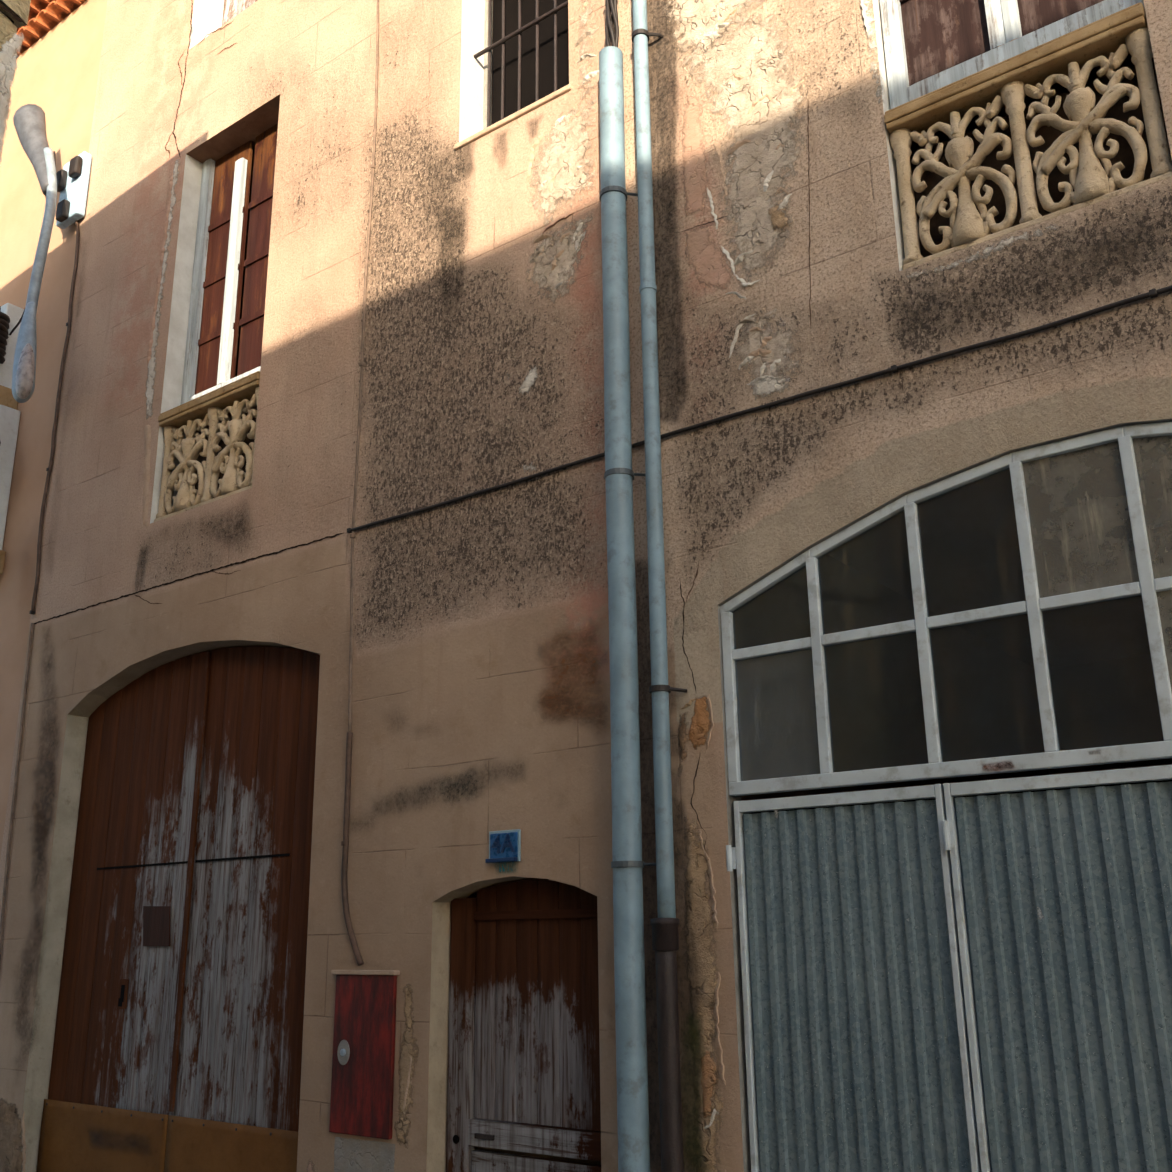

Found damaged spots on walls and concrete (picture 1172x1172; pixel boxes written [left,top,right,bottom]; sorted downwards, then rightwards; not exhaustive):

peeling [0,33,24,161]
crack [165,0,238,158]
peeling [526,0,599,303]
peeling [665,0,805,299]
peeling [145,161,179,419]
peeling [729,308,802,400]
crack [680,563,699,691]
spalling [678,694,714,769]
crack [690,757,709,877]
spalling [684,817,726,1172]